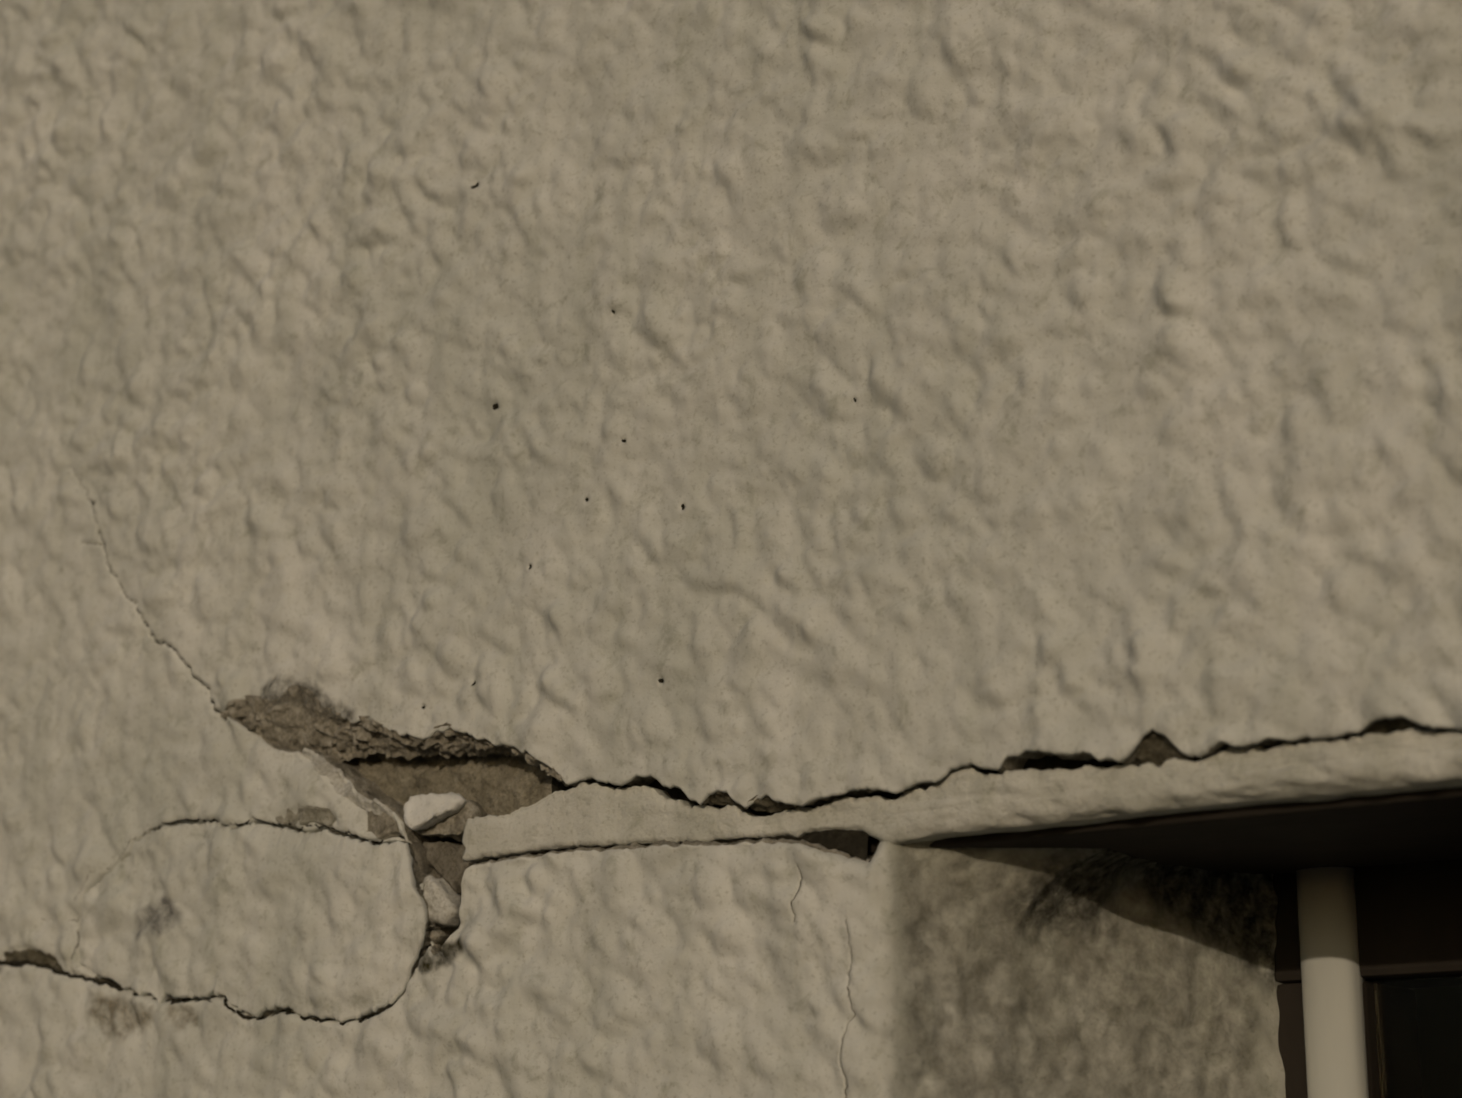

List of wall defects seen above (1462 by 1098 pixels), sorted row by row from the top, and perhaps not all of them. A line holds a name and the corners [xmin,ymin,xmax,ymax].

crack [72,466,227,720]
spalling [220,685,573,840]
crack [985,755,1124,774]
crack [1269,728,1445,749]
crack [0,817,405,1025]
crack [476,777,905,922]